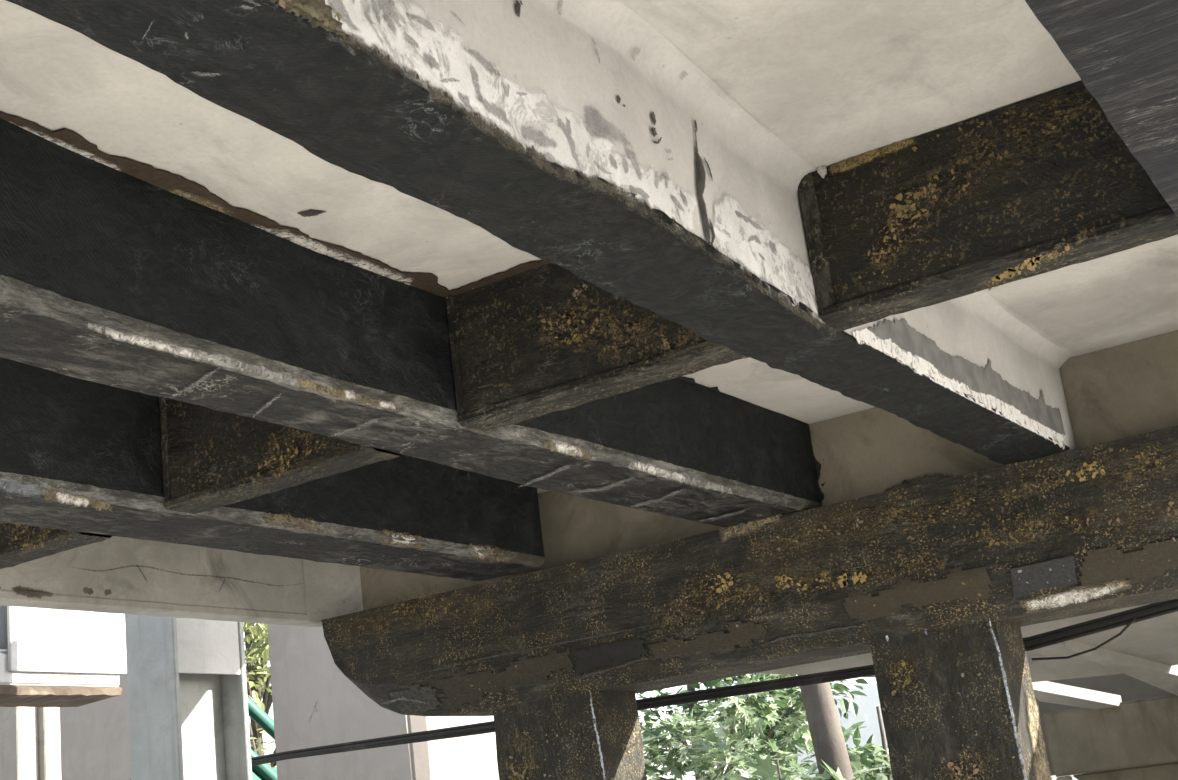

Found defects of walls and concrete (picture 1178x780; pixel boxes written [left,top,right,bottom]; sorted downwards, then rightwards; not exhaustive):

peeling [0,111,551,298]
peeling [270,0,837,337]
peeling [87,323,396,420]
peeling [853,319,1065,449]
leakage [886,473,952,492]
leakage [989,618,1027,780]